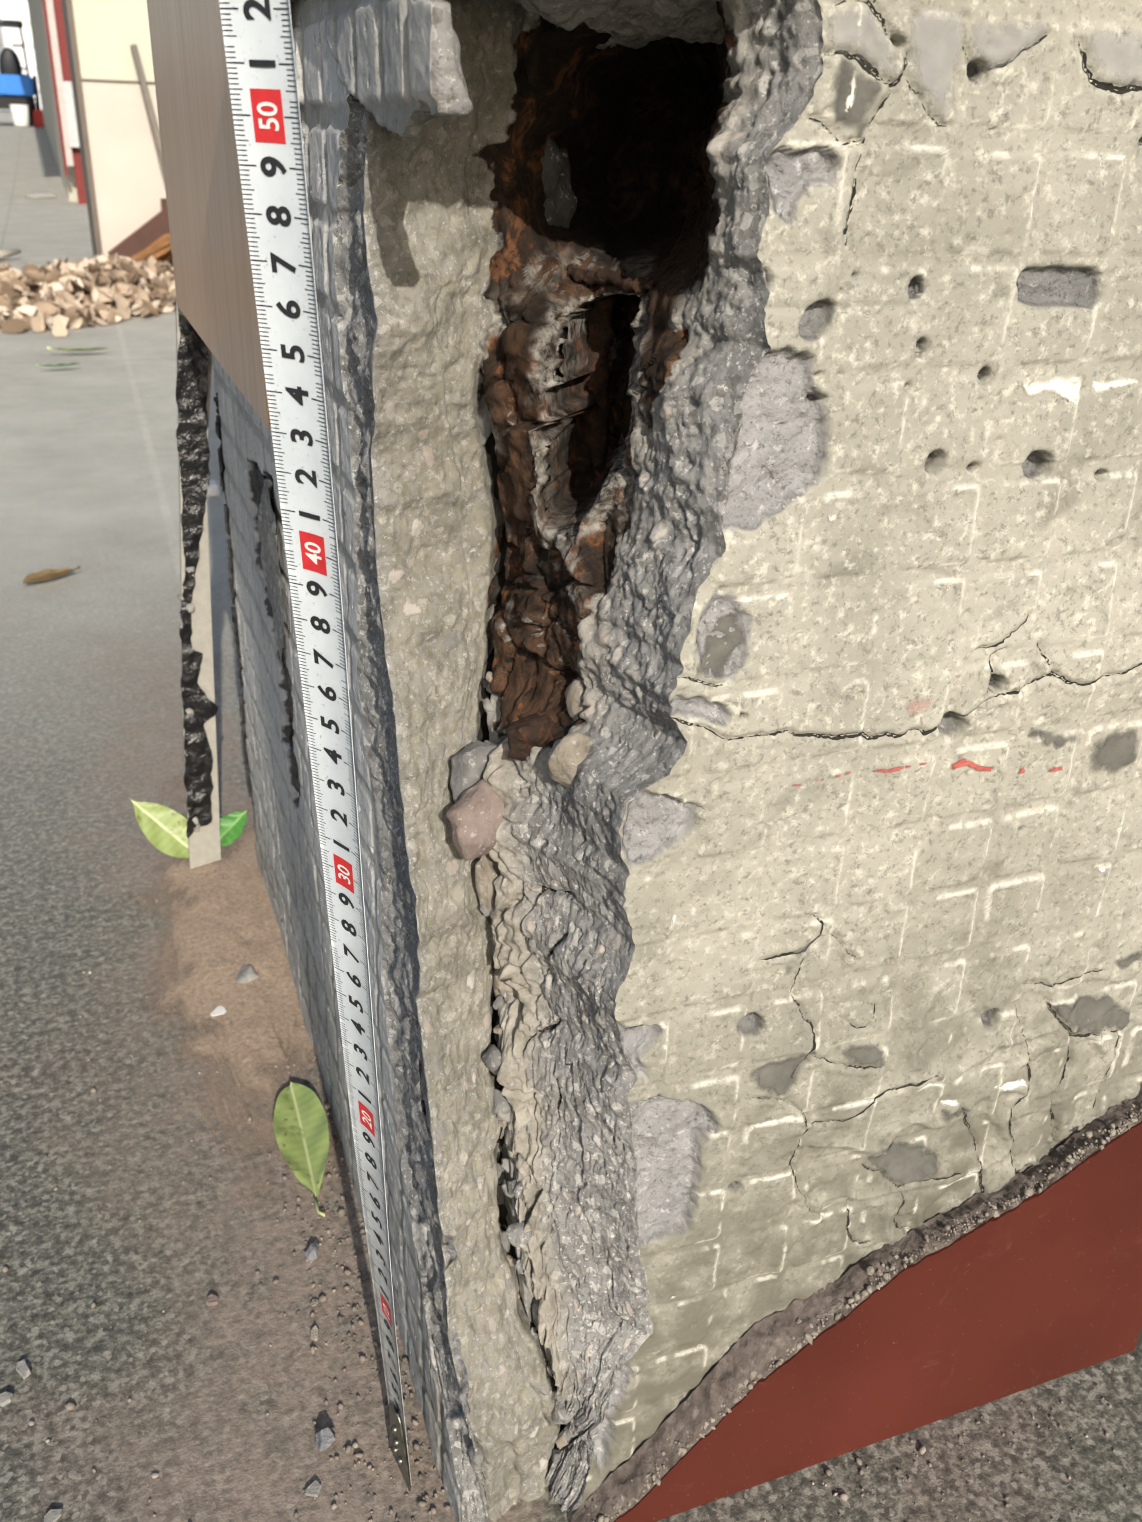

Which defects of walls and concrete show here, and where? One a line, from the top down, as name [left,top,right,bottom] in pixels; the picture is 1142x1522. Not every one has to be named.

crack [809,0,943,245]
crack [963,34,1142,94]
rust [537,129,714,467]
rust [487,322,544,558]
crack [477,383,577,742]
rust [490,603,583,729]
spalling [332,0,890,1522]
crack [670,614,1142,741]
crack [490,997,557,1047]
crack [752,915,938,1211]
crack [846,970,1125,1244]
crack [496,1126,553,1378]